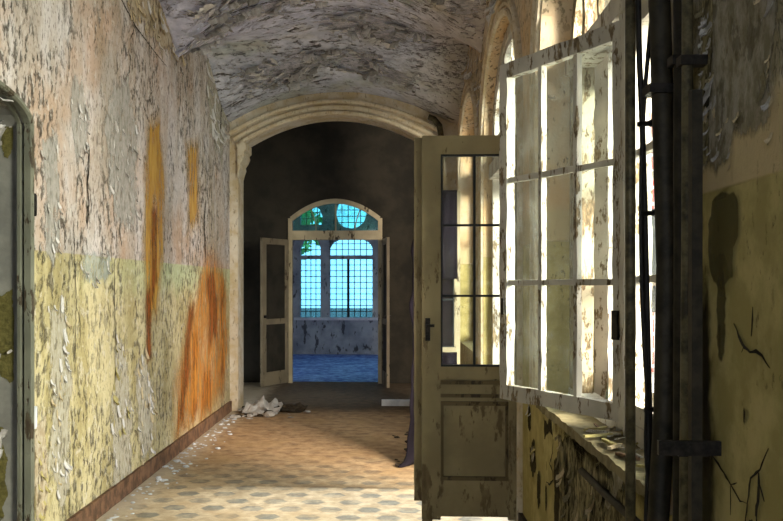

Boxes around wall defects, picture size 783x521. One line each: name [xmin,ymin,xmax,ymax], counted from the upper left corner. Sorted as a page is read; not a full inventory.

peeling [127,0,434,172]
peeling [412,0,500,129]
peeling [695,0,778,173]
rust [145,123,164,358]
flaking render [0,289,14,383]
rust [178,259,227,432]
leakage [702,193,738,440]
crack [734,307,770,368]
flaking render [0,427,8,521]
spalling [525,404,625,521]
crack [712,448,769,521]